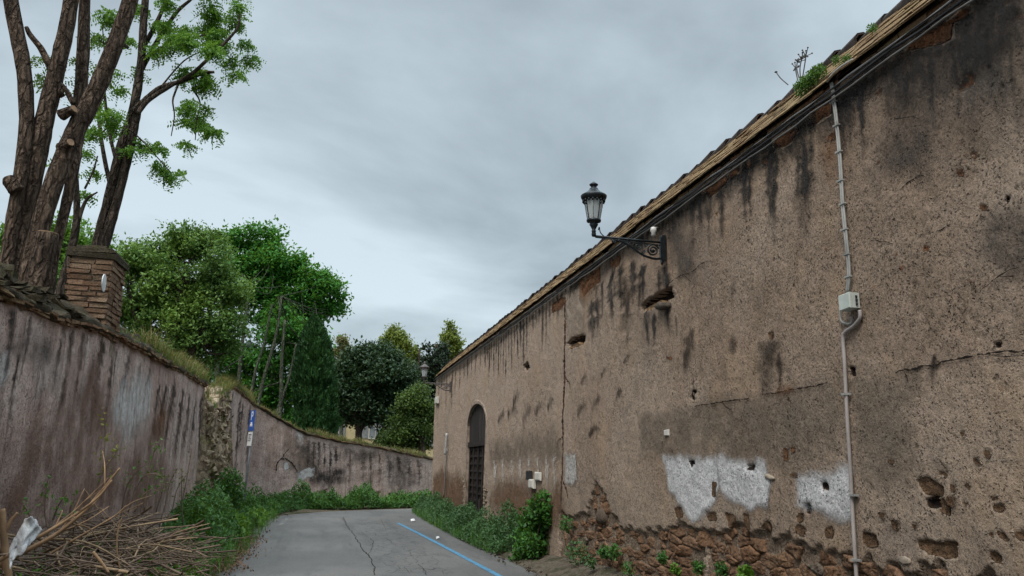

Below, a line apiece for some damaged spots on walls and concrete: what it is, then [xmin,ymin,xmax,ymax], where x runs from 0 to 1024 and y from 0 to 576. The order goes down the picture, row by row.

spalling [908,9,970,49]
water stain [438,0,1024,397]
water stain [0,311,202,541]
water stain [229,397,251,465]
water stain [293,433,420,486]
crack [557,299,570,503]
crack [677,344,827,410]
crack [896,350,1024,381]
spalling [483,447,959,576]
spalling [916,471,971,515]
spalling [984,551,1003,576]
spalling [984,529,1024,549]